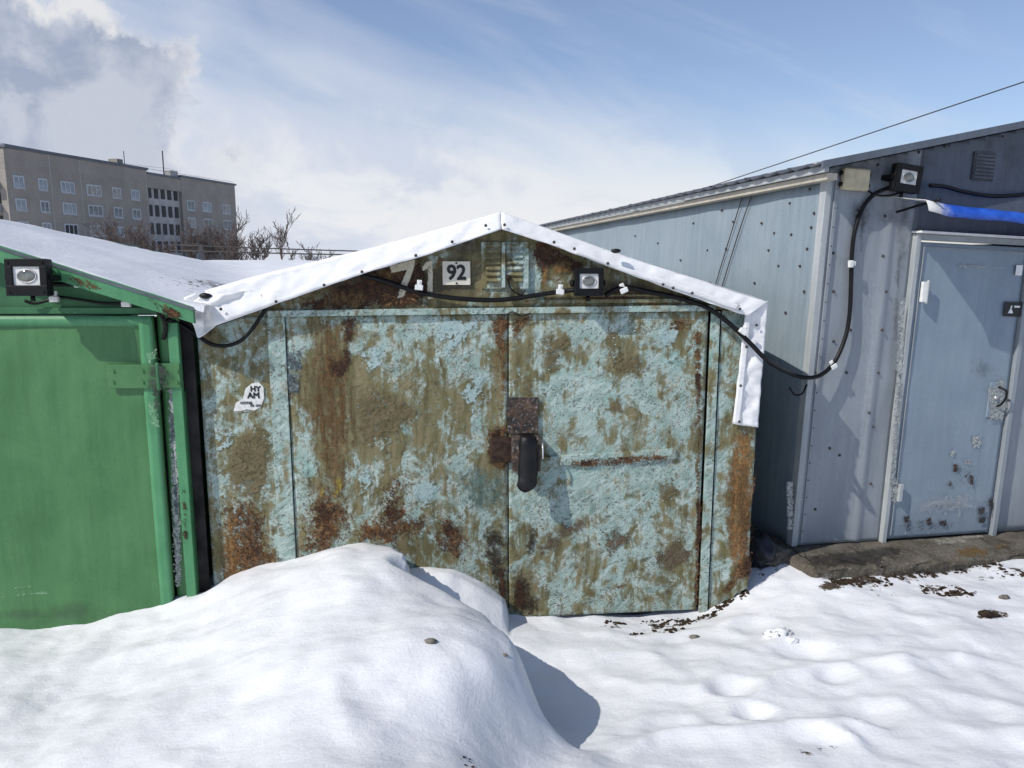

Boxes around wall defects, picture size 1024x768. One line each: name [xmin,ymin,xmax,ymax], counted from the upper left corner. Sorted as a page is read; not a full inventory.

corrosion [533,242,680,306]
peeling [286,350,302,394]
peeling [359,345,384,371]
corrosion [290,258,468,562]
peeling [433,318,478,358]
peeling [459,374,485,413]
peeling [603,320,678,375]
corrosion [571,455,667,467]
corrosion [669,318,703,605]
corrosion [211,497,279,582]
peeling [598,527,634,557]
corrosion [718,429,755,597]